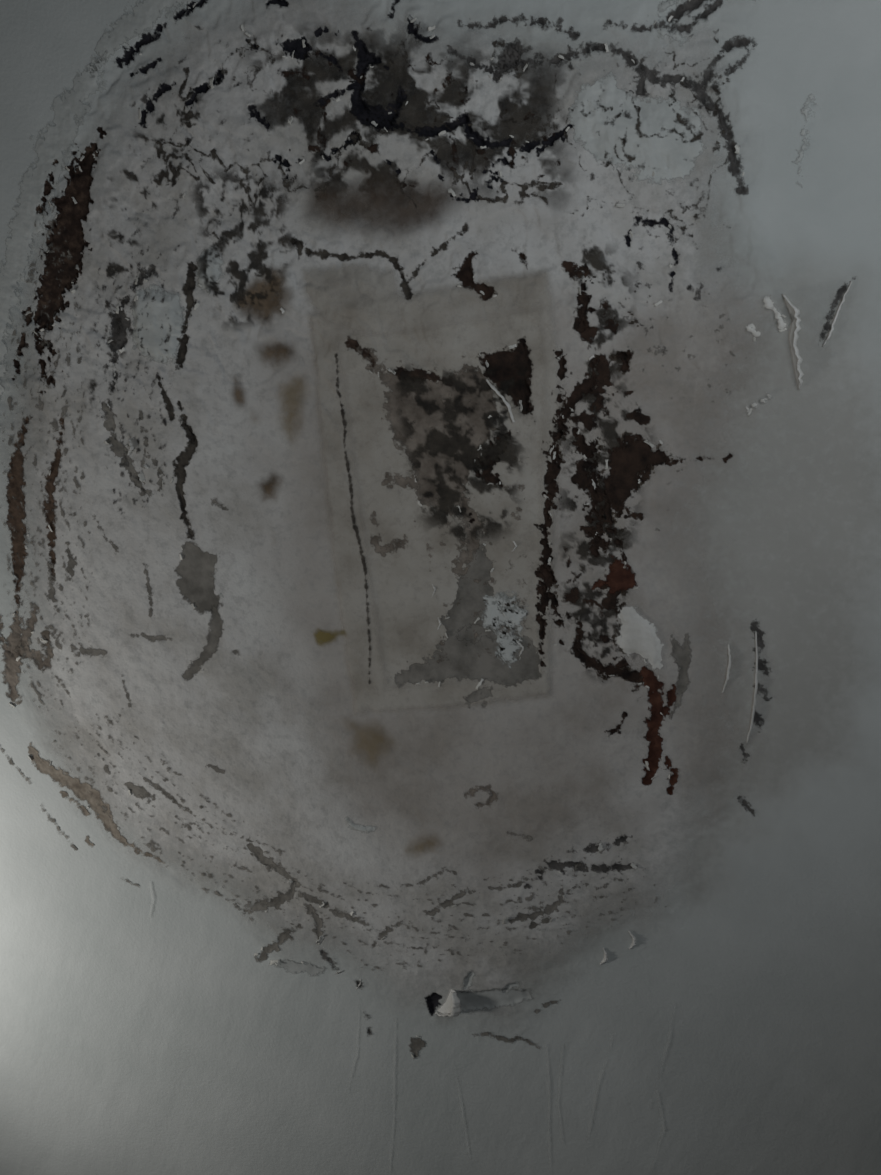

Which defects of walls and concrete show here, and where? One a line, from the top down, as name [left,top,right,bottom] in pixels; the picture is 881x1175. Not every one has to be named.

crack [158,261,200,539]
crack [335,354,371,684]
peeling [0,0,804,1017]
water stain [258,36,557,227]
crack [154,0,756,300]
water stain [398,372,523,538]
crack [534,280,642,685]
water stain [566,306,630,658]
water stain [579,247,624,284]
corrosion [592,556,638,594]
peeling [822,281,852,346]
corrosion [640,666,679,795]